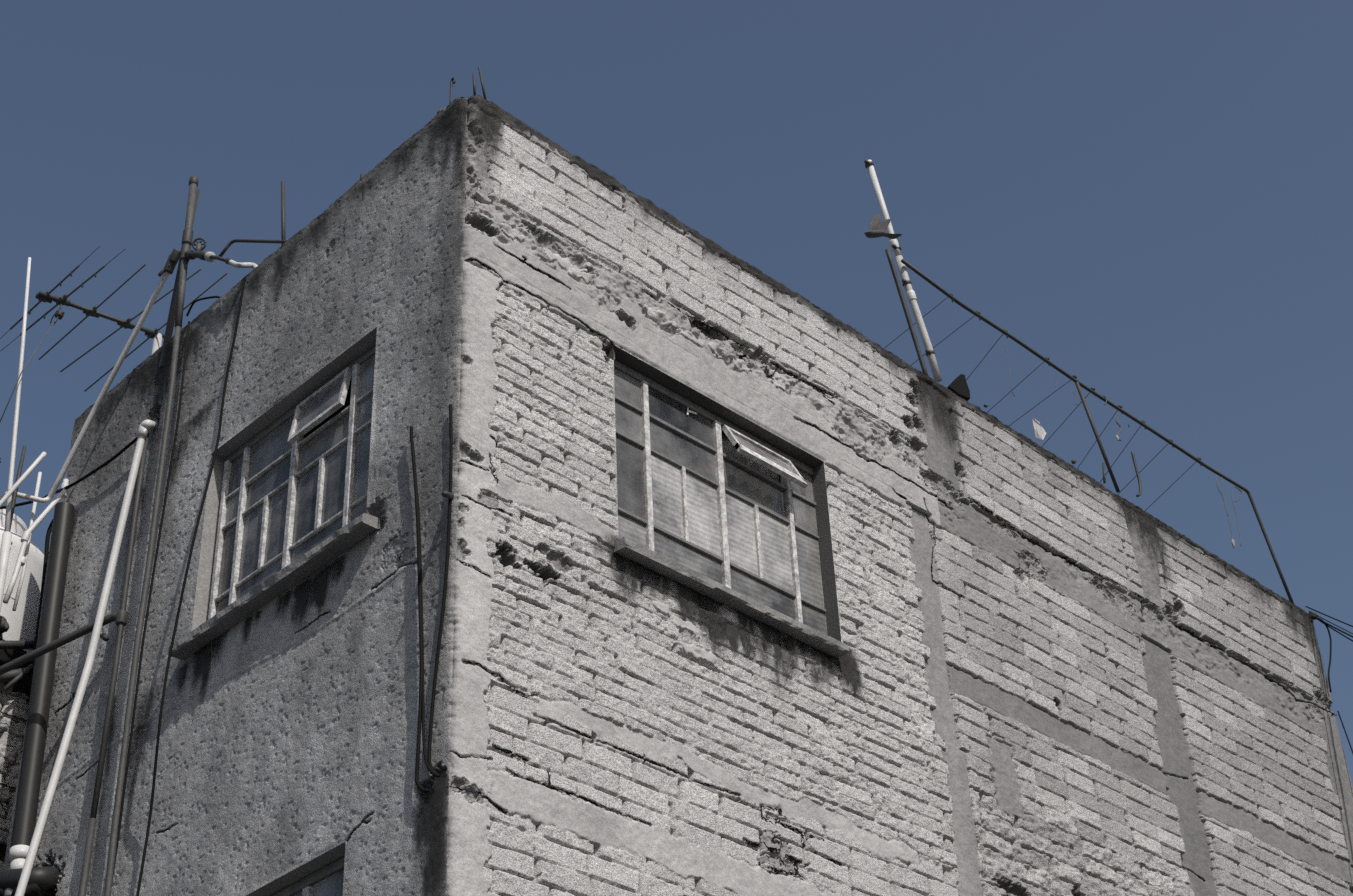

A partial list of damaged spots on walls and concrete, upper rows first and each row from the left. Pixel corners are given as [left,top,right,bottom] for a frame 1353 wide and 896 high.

peeling [464,120,608,290]
spalling [458,438,483,463]
spalling [602,339,615,363]
peeling [614,303,786,392]
water stain [882,347,1002,452]
water stain [276,556,344,621]
spalling [455,490,499,560]
spalling [491,542,573,587]
water stain [598,537,861,696]
water stain [1018,433,1197,575]
water stain [1212,553,1323,671]
water stain [415,775,449,896]